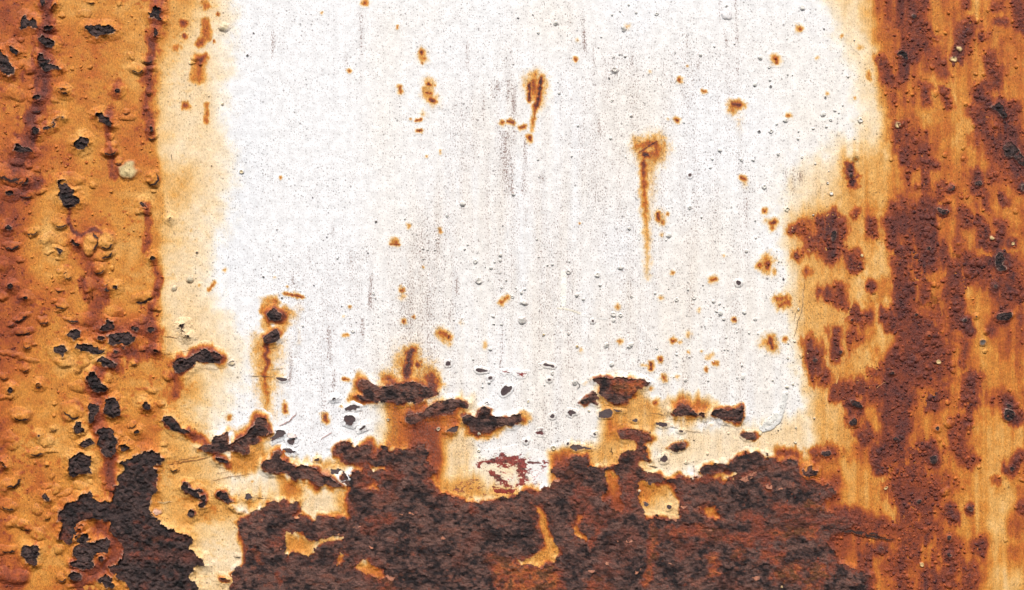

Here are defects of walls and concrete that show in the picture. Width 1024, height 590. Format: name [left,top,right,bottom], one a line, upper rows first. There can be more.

rust [393,43,445,135]
rust [496,62,556,147]
rust [0,0,338,590]
rust [527,0,1024,590]
rust [366,406,409,446]
peeling [14,313,882,590]
rust [423,416,486,476]